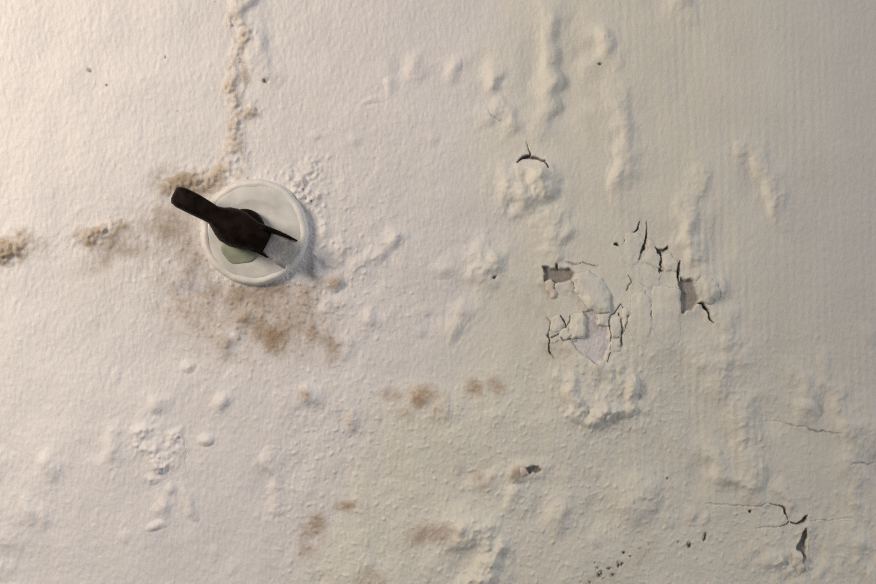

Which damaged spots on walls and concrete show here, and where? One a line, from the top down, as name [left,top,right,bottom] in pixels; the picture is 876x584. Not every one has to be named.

crack [517,143,549,168]
peeling [542,232,720,366]
crack [705,503,854,530]
peeling [791,528,810,576]